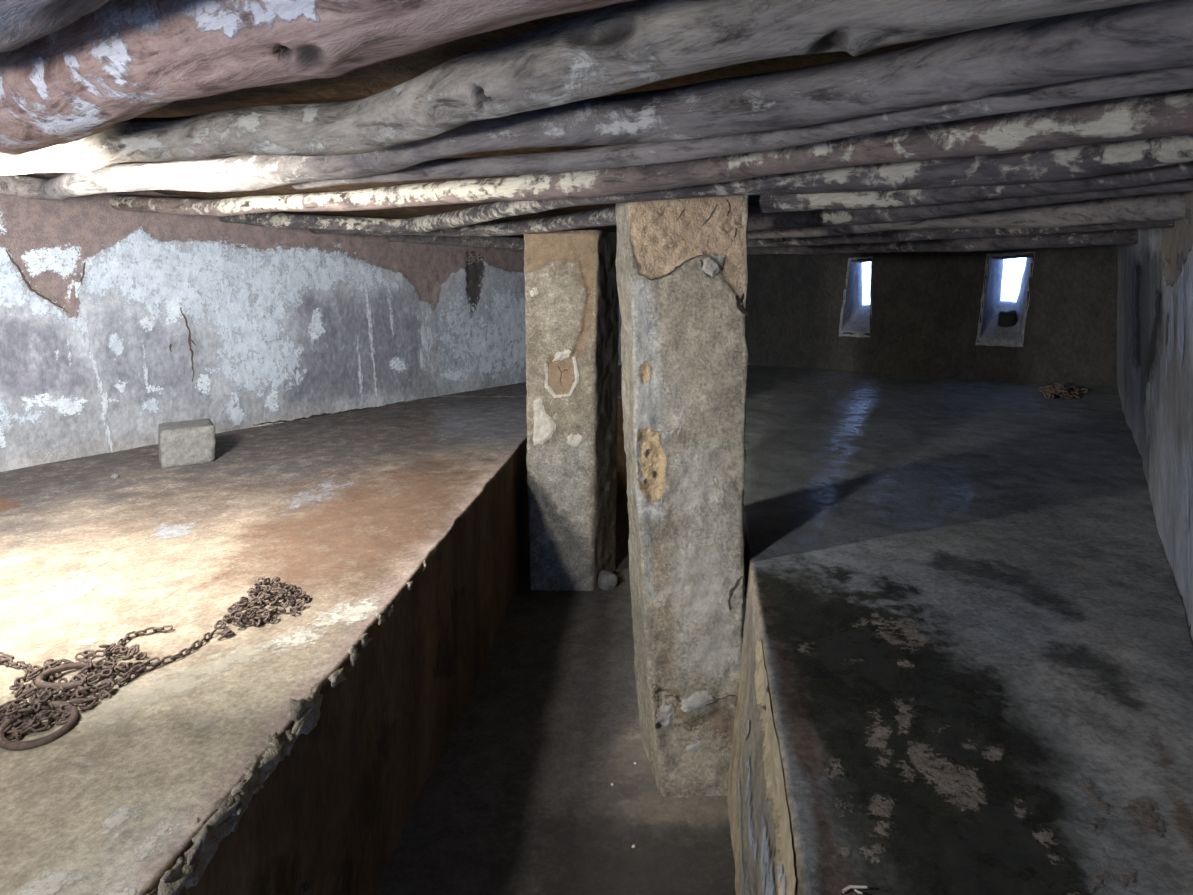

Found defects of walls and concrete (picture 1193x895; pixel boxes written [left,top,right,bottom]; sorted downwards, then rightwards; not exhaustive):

peeling [0,190,597,448]
spalling [630,195,746,308]
water stain [1128,252,1193,445]
spalling [637,427,667,506]
water stain [635,279,743,684]
spalling [101,598,394,895]
spalling [652,638,796,895]
water stain [738,755,785,895]
spalling [852,613,931,669]
water stain [757,566,1089,895]
water stain [930,554,1084,619]
water stain [1045,642,1142,710]